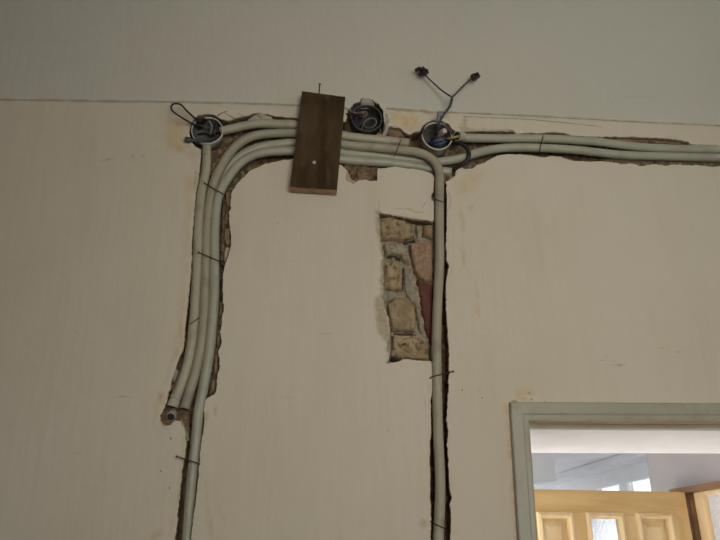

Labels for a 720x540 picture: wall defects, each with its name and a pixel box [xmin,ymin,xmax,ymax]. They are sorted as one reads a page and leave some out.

flaking render [343,164,379,184]
flaking render [599,159,720,167]
flaking render [220,190,233,270]
flaking render [377,217,435,364]
flaking render [207,302,224,398]
flaking render [170,355,184,395]
flaking render [161,404,192,441]